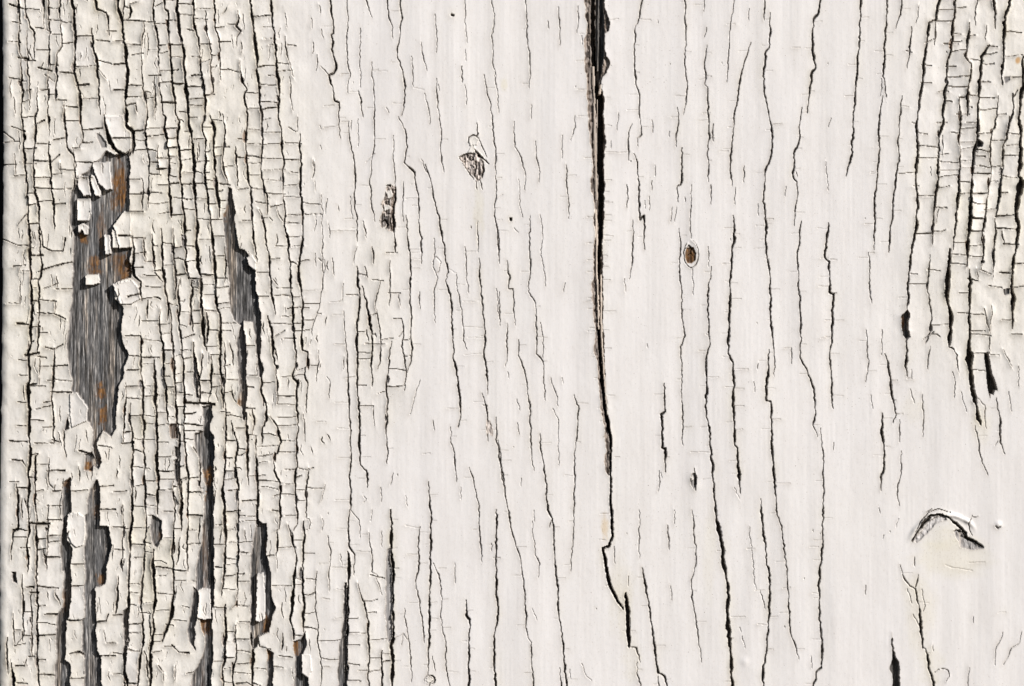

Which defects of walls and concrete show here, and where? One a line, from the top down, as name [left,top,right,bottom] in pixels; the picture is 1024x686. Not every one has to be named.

peeling [54,115,141,686]
peeling [222,187,264,421]
crack [3,0,592,686]
crack [605,0,1024,686]